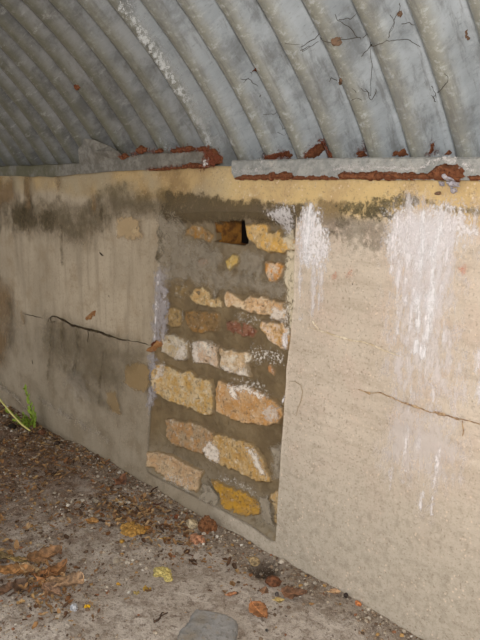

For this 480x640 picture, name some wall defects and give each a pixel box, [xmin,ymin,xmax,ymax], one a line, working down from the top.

corrosion [117,144,223,172]
corrosion [262,138,333,160]
corrosion [234,170,432,181]
leakage [152,191,331,366]
leakage [336,193,479,402]
crack [25,314,147,345]
leakage [146,352,165,411]
leakage [221,366,267,400]
leakage [262,399,284,422]
crack [358,389,480,436]
leakage [202,441,220,463]
leakage [245,447,264,475]